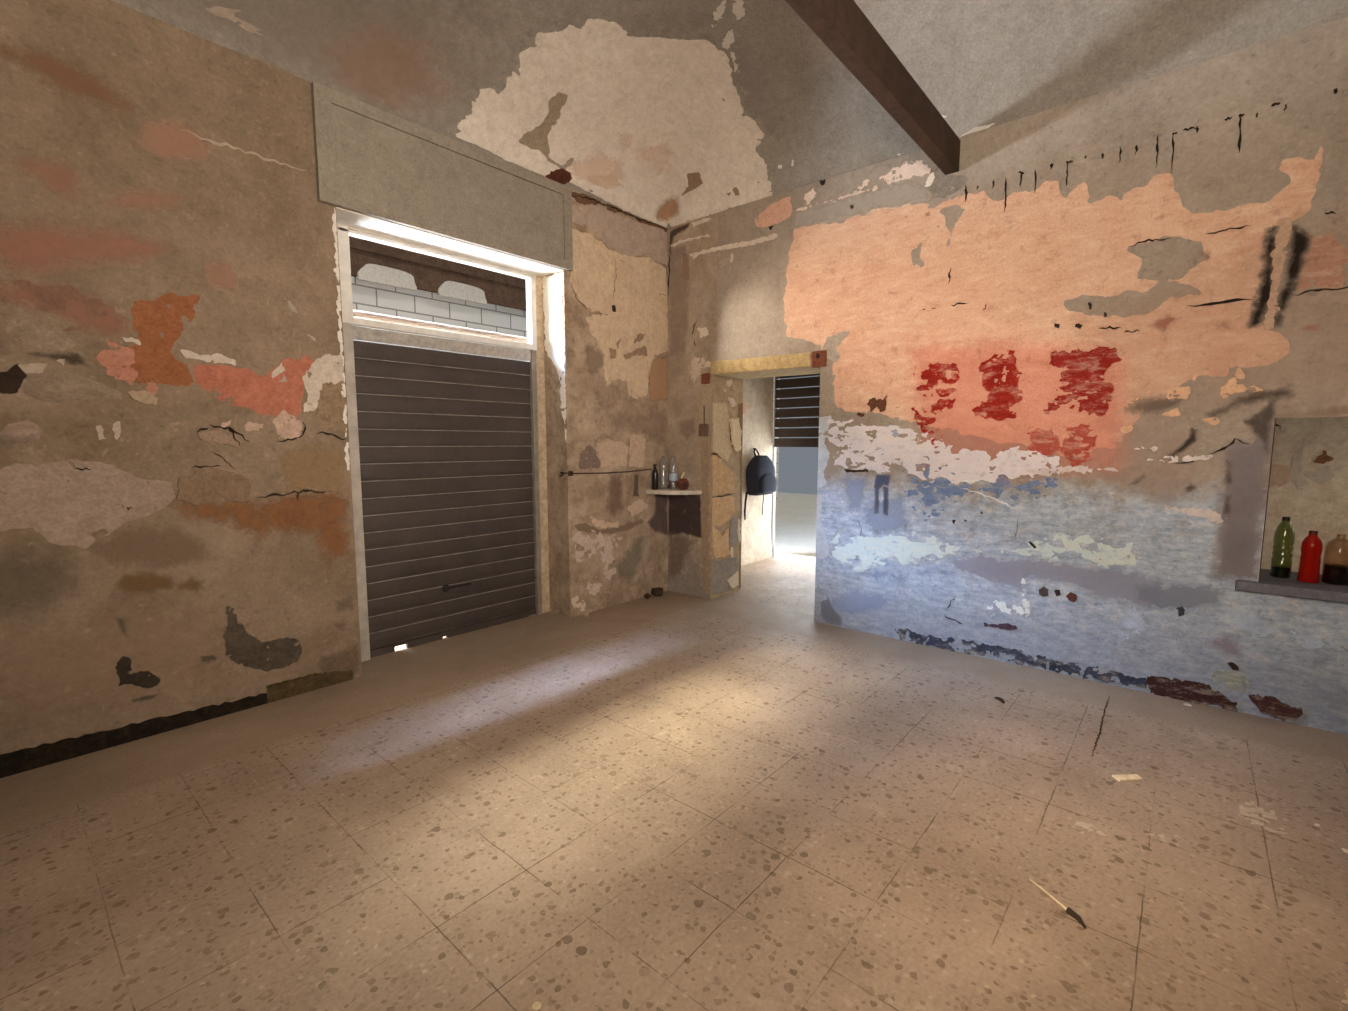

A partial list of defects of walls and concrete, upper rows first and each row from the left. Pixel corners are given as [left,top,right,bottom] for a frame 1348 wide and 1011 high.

peeling [456,0,1323,593]
leakage [1274,225,1311,326]
peeling [1296,231,1348,292]
peeling [0,208,350,471]
peeling [0,459,175,549]
peeling [201,606,302,672]
peeling [896,628,955,652]
spalling [983,622,1017,630]
spalling [1039,587,1077,602]
peeling [1082,666,1147,688]